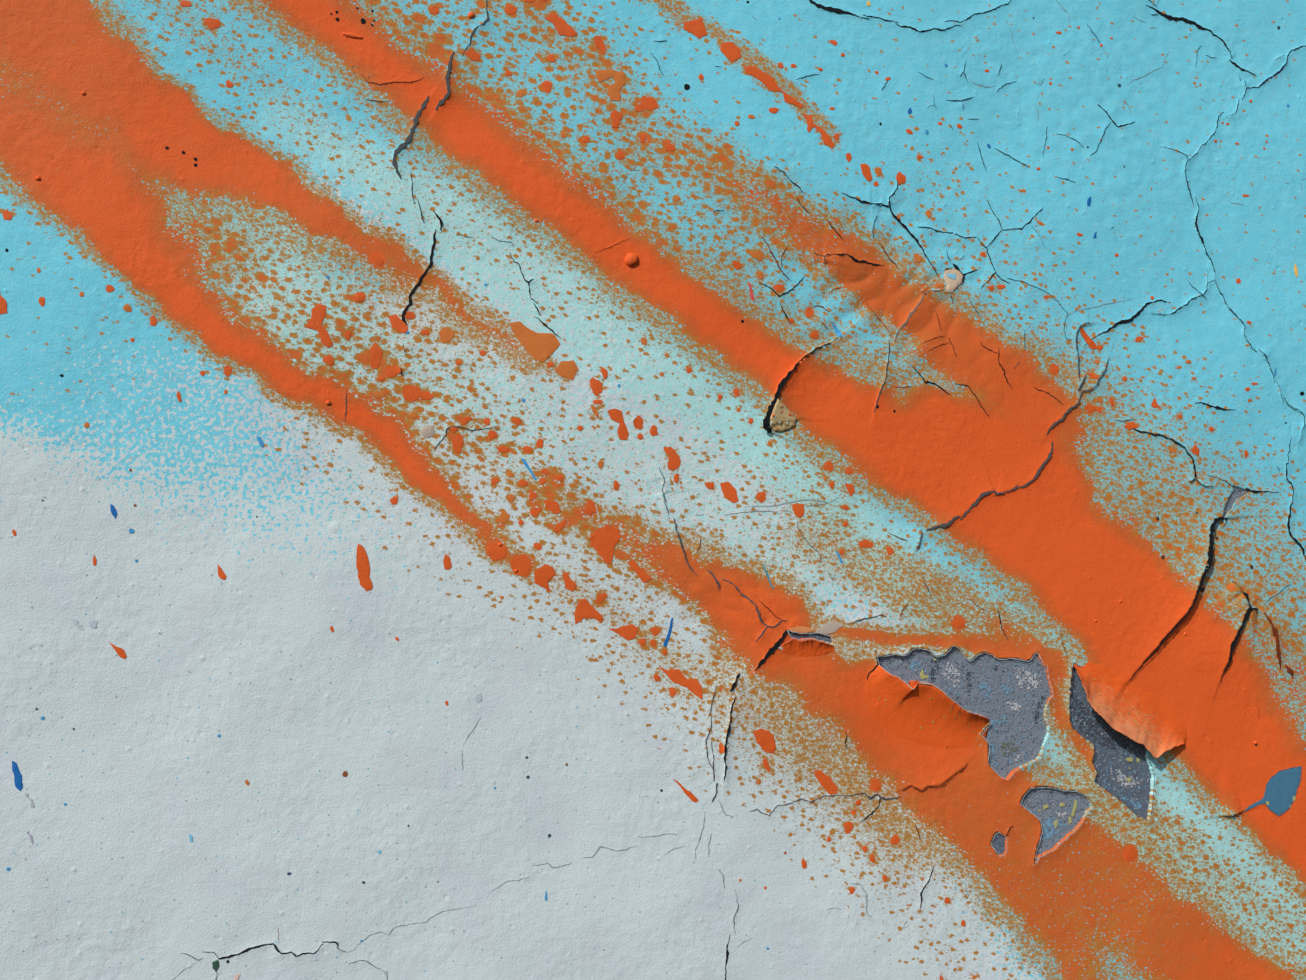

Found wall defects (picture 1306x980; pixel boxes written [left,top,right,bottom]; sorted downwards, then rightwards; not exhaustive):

crack [361,0,559,375]
peeling [770,399,797,432]
crack [760,0,1306,681]
crack [172,468,967,980]
peeling [865,646,1054,780]
peeling [991,832,1007,857]
peeling [1020,662,1187,864]
peeling [1244,766,1302,816]